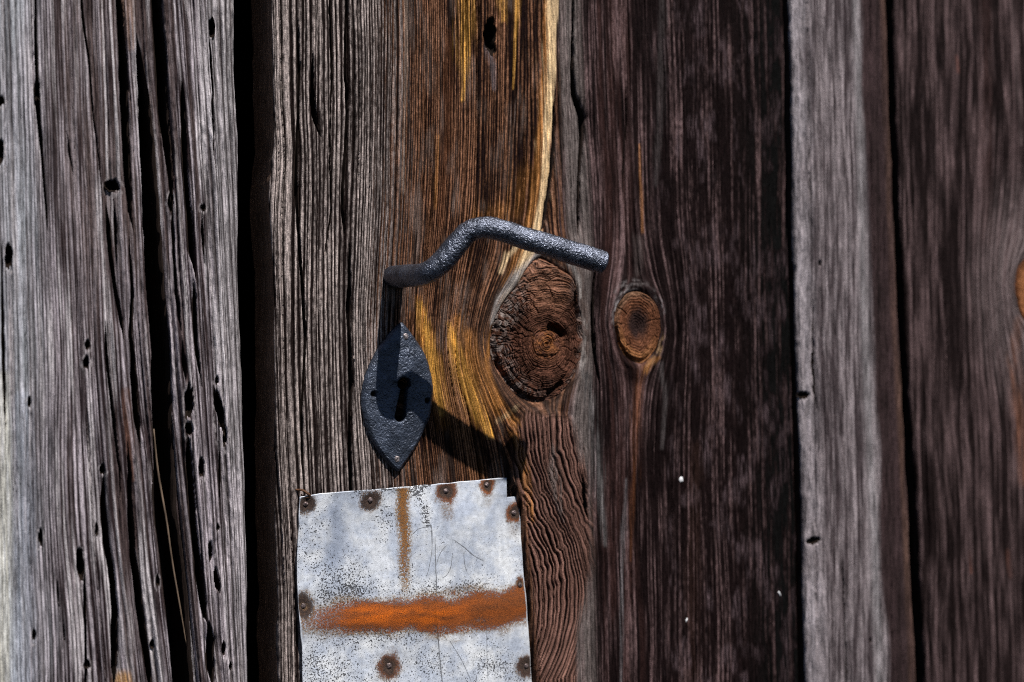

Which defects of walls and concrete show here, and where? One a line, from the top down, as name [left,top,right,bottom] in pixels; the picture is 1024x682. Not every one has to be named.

rust [479,480,495,497]
rust [298,483,527,639]
rust [376,650,402,680]